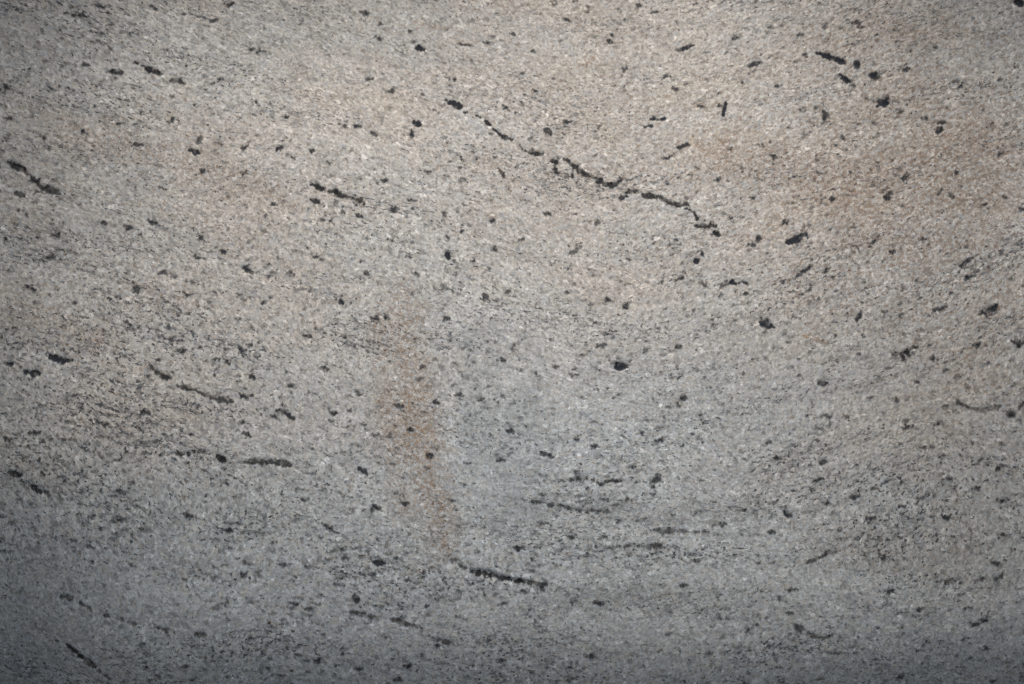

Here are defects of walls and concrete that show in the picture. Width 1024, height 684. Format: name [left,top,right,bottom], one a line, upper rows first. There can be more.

crack [463,111,721,237]